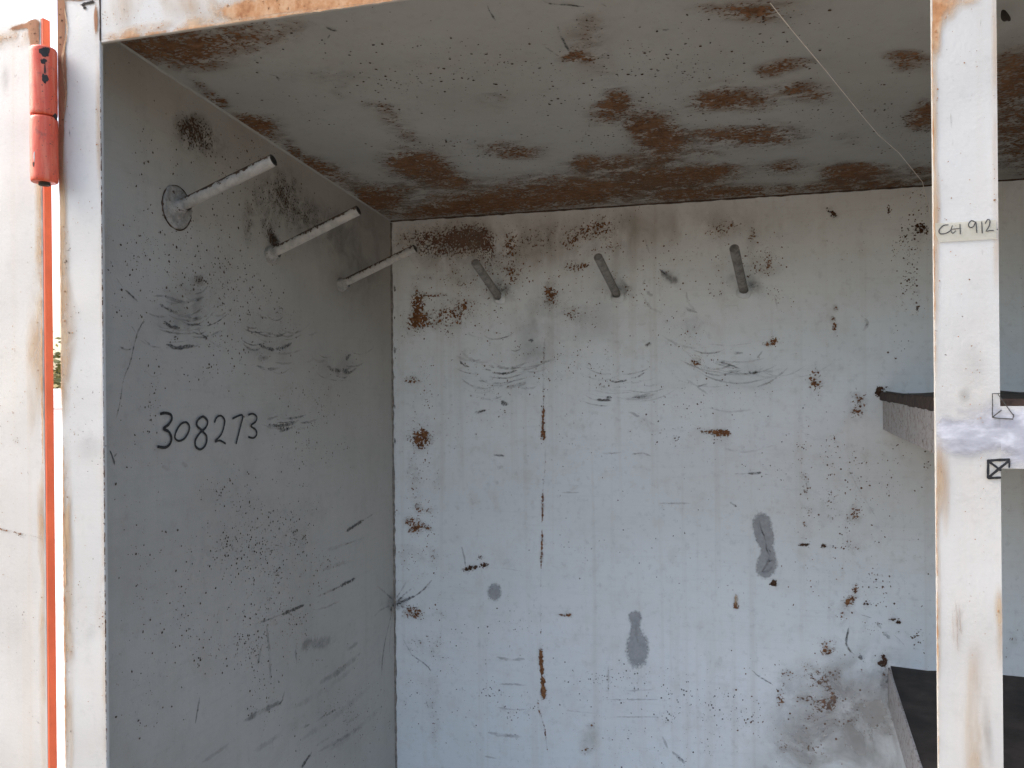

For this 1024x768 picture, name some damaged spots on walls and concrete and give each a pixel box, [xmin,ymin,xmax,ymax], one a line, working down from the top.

corrosion [94,0,972,390]
corrosion [99,377,117,698]
corrosion [396,376,444,579]
corrosion [451,327,629,444]
corrosion [641,395,731,444]
water stain [753,514,777,577]
water stain [627,612,648,666]
corrosion [631,635,887,766]